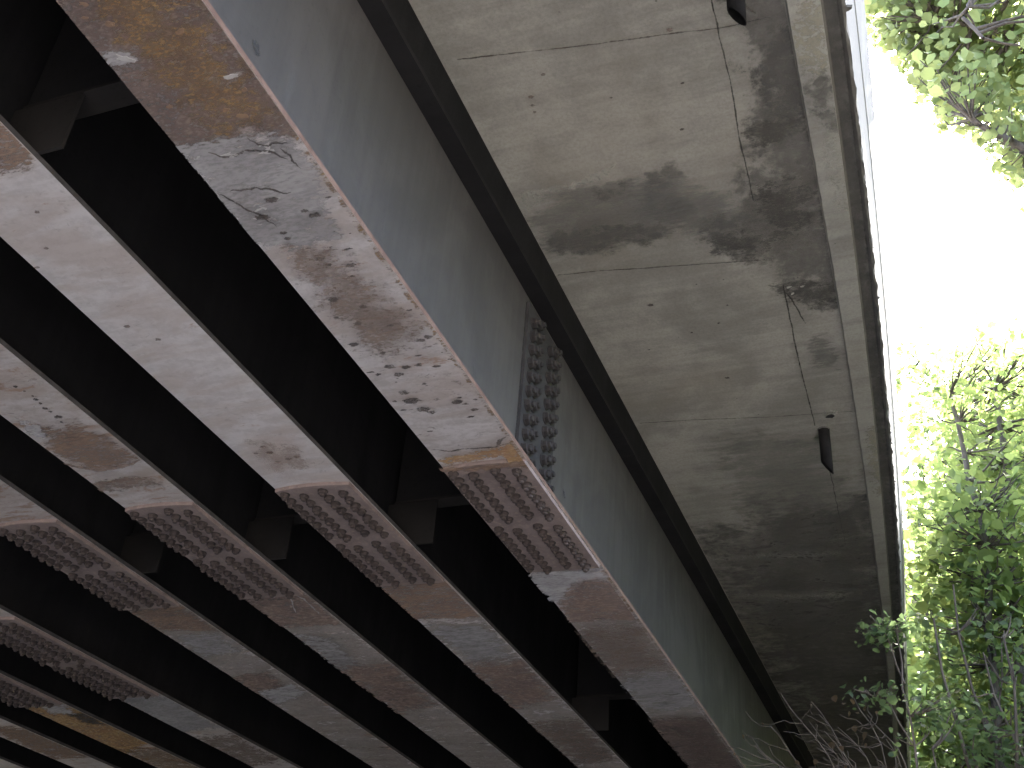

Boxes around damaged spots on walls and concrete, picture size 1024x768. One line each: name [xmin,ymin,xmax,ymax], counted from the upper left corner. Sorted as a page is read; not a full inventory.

rust [56,0,471,385]
crack [457,0,770,201]
leakage [699,0,851,310]
rust [13,385,161,492]
rust [438,427,531,472]
crack [648,285,852,426]